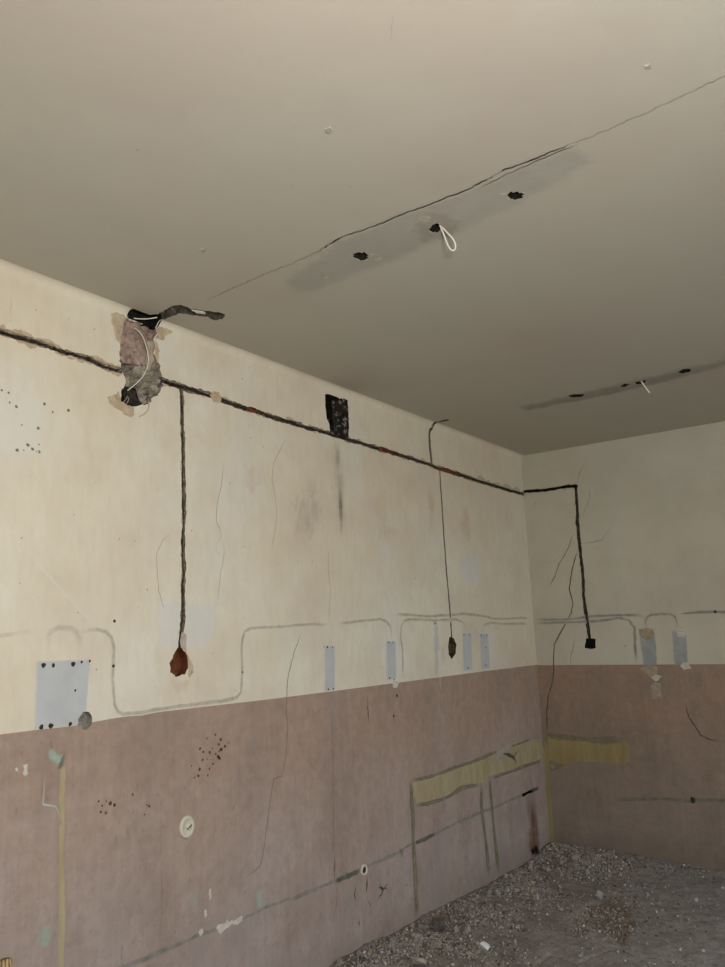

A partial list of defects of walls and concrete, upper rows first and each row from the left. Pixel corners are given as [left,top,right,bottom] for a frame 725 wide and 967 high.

crack [207,76,725,300]
spalling [111,305,225,372]
spalling [107,392,134,417]
spalling [325,394,349,442]
crack [541,465,613,728]
crack [245,634,301,879]
peeling [216,916,243,934]